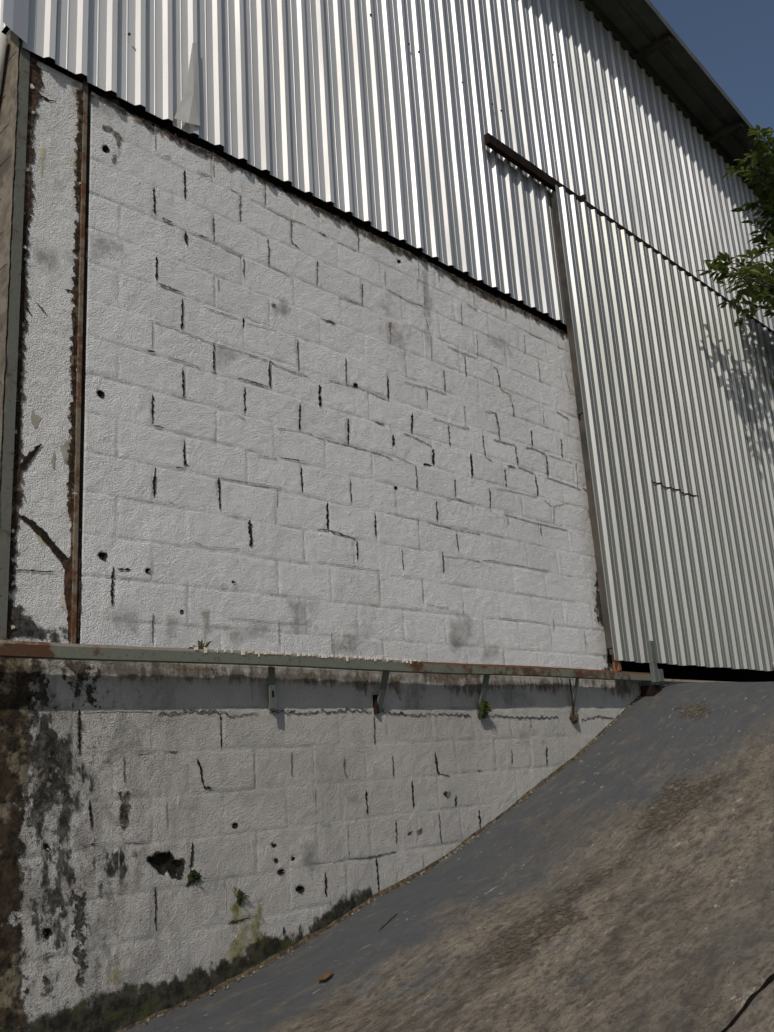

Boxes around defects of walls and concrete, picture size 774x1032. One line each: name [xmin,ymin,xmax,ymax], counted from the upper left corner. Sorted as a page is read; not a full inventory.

crack [147,125,579,609]
crack [19,444,42,474]
crack [15,499,81,572]
crack [110,566,131,605]
crack [227,617,332,649]
damp [62,660,634,710]
crack [78,708,614,897]
damp [0,657,137,1032]
crack [721,973,774,1032]